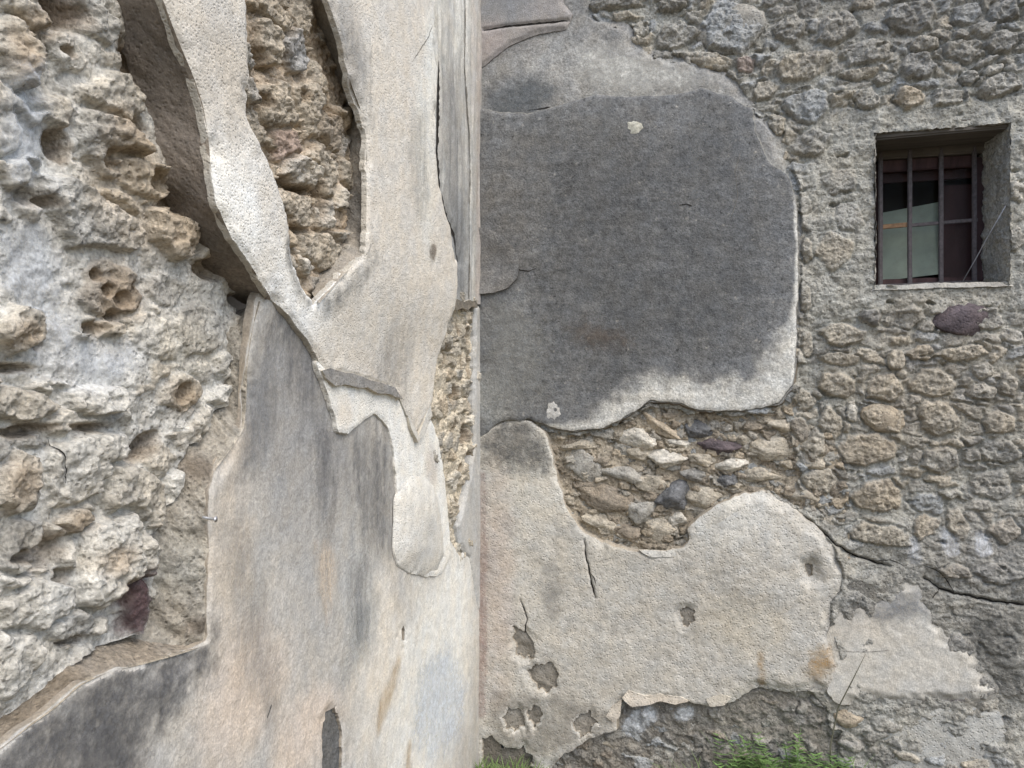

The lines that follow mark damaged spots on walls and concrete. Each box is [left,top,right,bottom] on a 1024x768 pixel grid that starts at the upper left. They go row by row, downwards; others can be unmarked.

damp [580,47,693,89]
spalling [245,0,367,305]
spalling [0,0,271,718]
spalling [548,401,850,557]
crack [584,541,596,595]
crack [821,530,1024,605]
spalling [680,607,695,626]
spalling [513,625,559,692]
spalling [322,709,342,768]
spalling [503,705,543,730]
spalling [556,684,841,768]